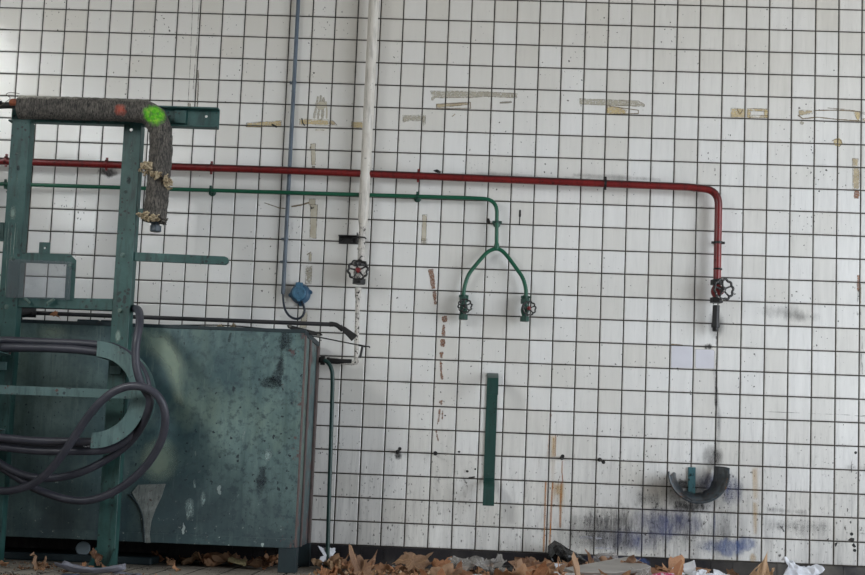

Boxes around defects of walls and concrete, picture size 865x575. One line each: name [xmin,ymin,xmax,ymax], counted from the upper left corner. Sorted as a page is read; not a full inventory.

rust [428,269,437,305]
rust [543,473,563,550]